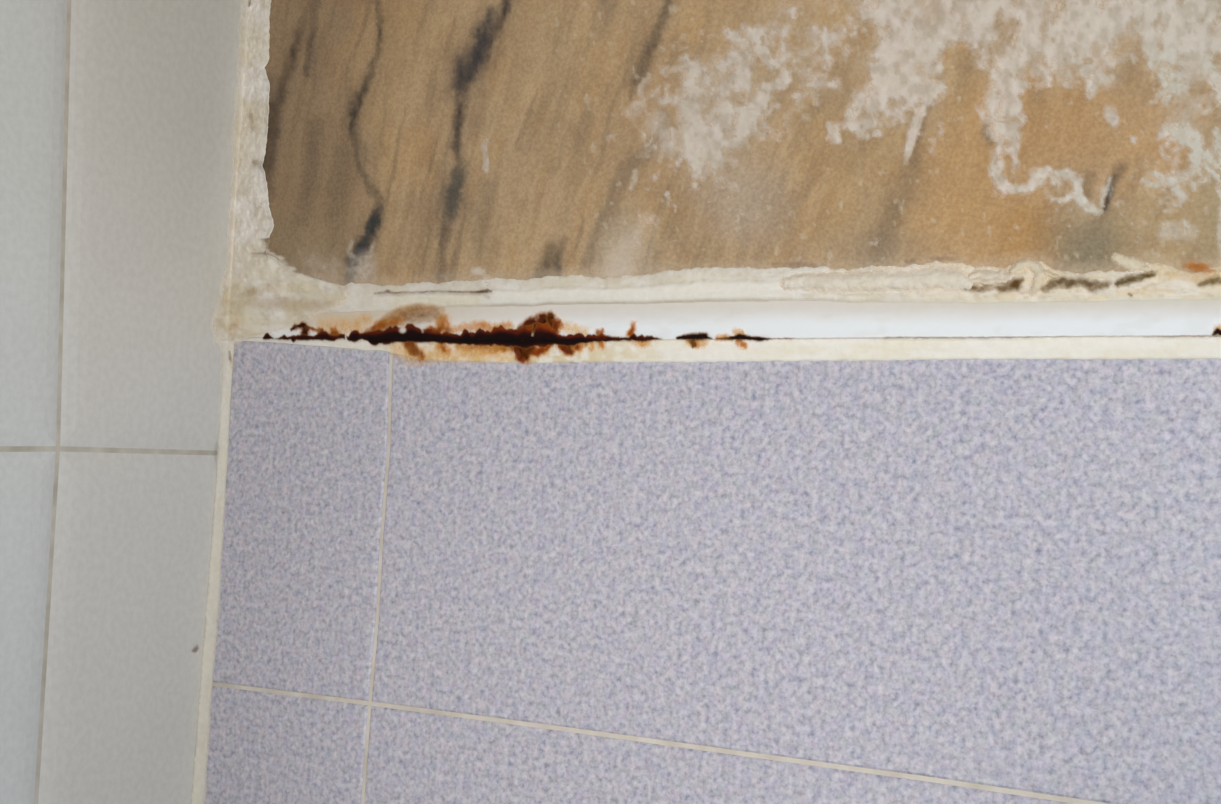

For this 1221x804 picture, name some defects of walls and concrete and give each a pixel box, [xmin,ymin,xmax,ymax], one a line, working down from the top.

corrosion [263,311,660,363]
corrosion [676,331,790,348]